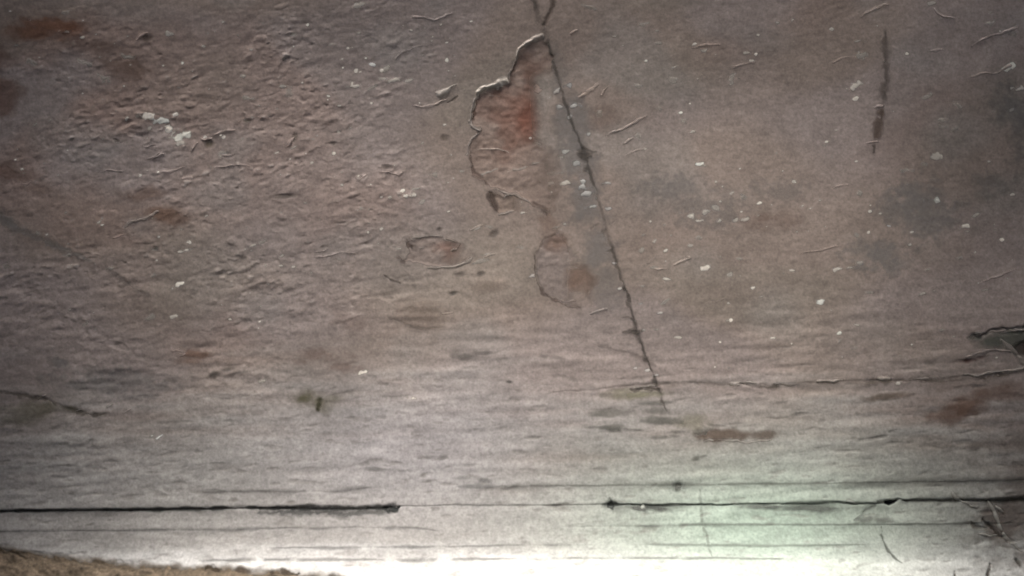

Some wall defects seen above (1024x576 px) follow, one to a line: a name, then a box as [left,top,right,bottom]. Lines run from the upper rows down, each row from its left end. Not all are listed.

peeling [466,33,554,215]
crack [533,0,612,211]
peeling [397,229,495,269]
crack [612,249,665,408]
crack [729,378,844,386]
crack [0,504,400,515]
crack [607,483,1024,512]